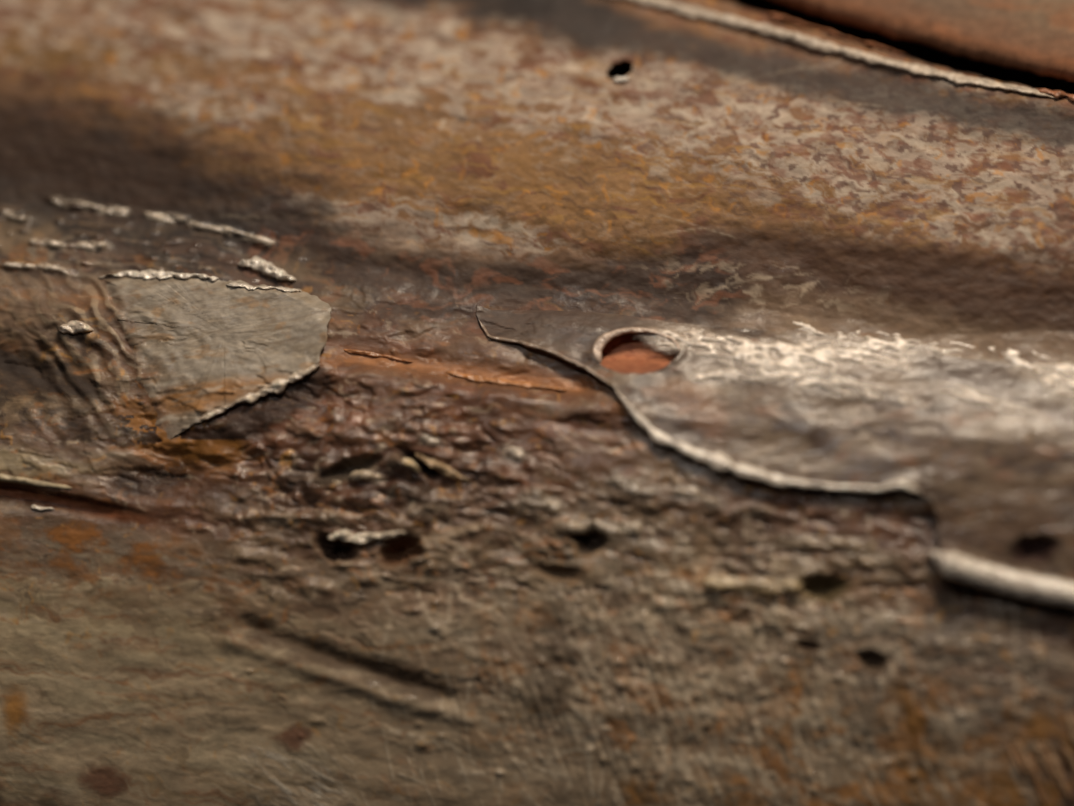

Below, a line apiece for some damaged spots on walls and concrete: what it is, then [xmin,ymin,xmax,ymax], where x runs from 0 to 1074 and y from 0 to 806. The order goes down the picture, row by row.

peeling [98,269,332,440]
spalling [313,443,446,487]
spalling [528,528,613,586]
spalling [1002,531,1067,569]
spalling [795,570,862,607]